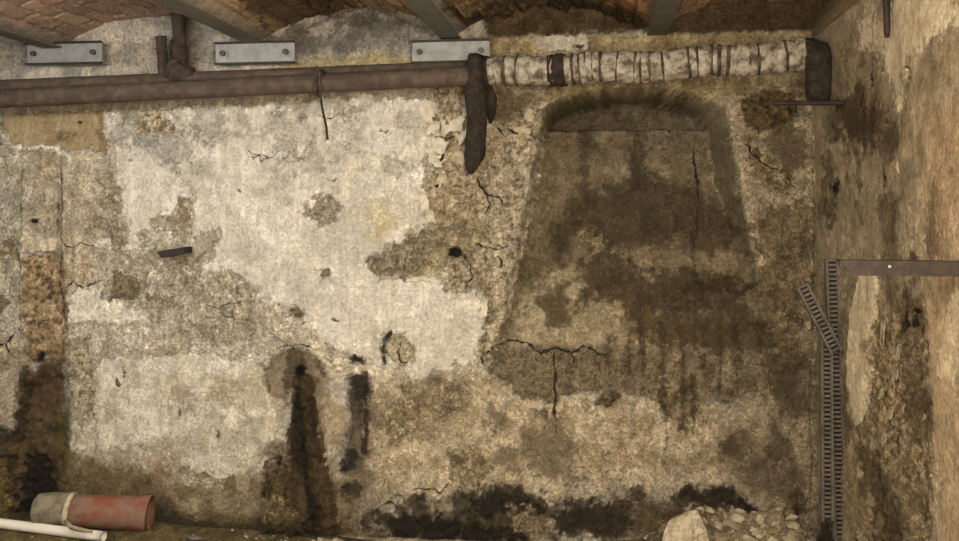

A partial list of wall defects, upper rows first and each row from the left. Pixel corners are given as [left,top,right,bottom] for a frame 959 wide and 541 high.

spalling [446,0,642,29]
damp [764,123,814,174]
damp [829,84,898,224]
damp [877,184,940,260]
peeling [0,87,632,490]
damp [0,130,812,541]
damp [878,276,920,332]
crack [480,339,606,433]
damp [852,441,909,541]